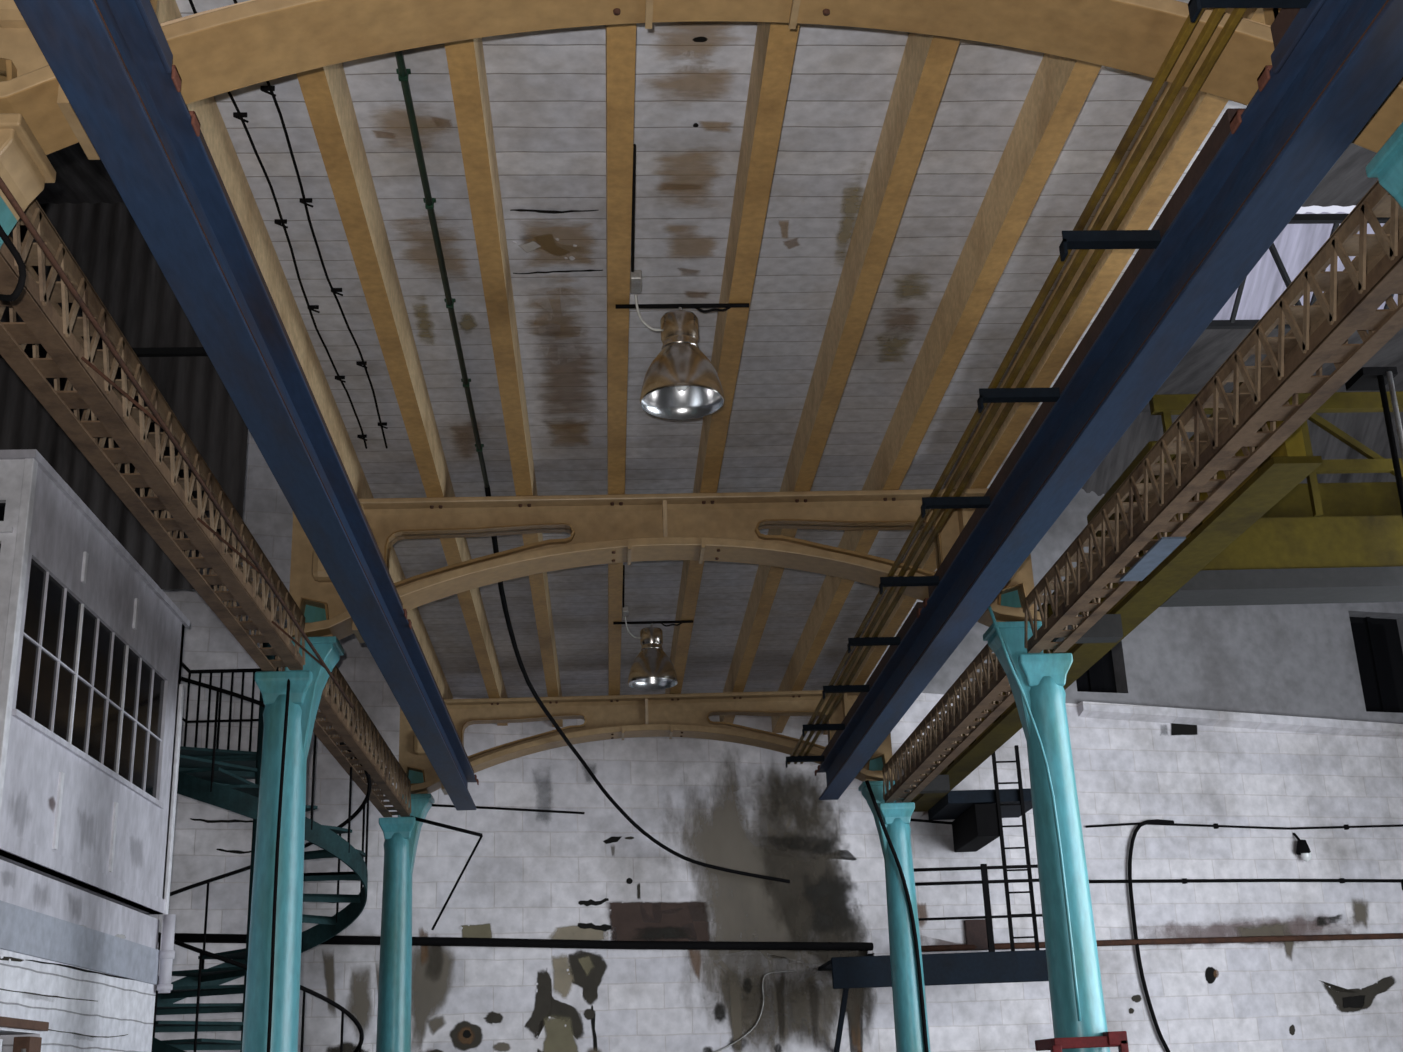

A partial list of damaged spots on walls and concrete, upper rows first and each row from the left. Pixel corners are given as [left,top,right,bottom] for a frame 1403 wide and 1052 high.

leakage [693,122,727,130]
leakage [530,228,588,263]
leakage [682,772,874,1052]
flaking render [525,878,712,1052]
spalling [1322,975,1395,1012]